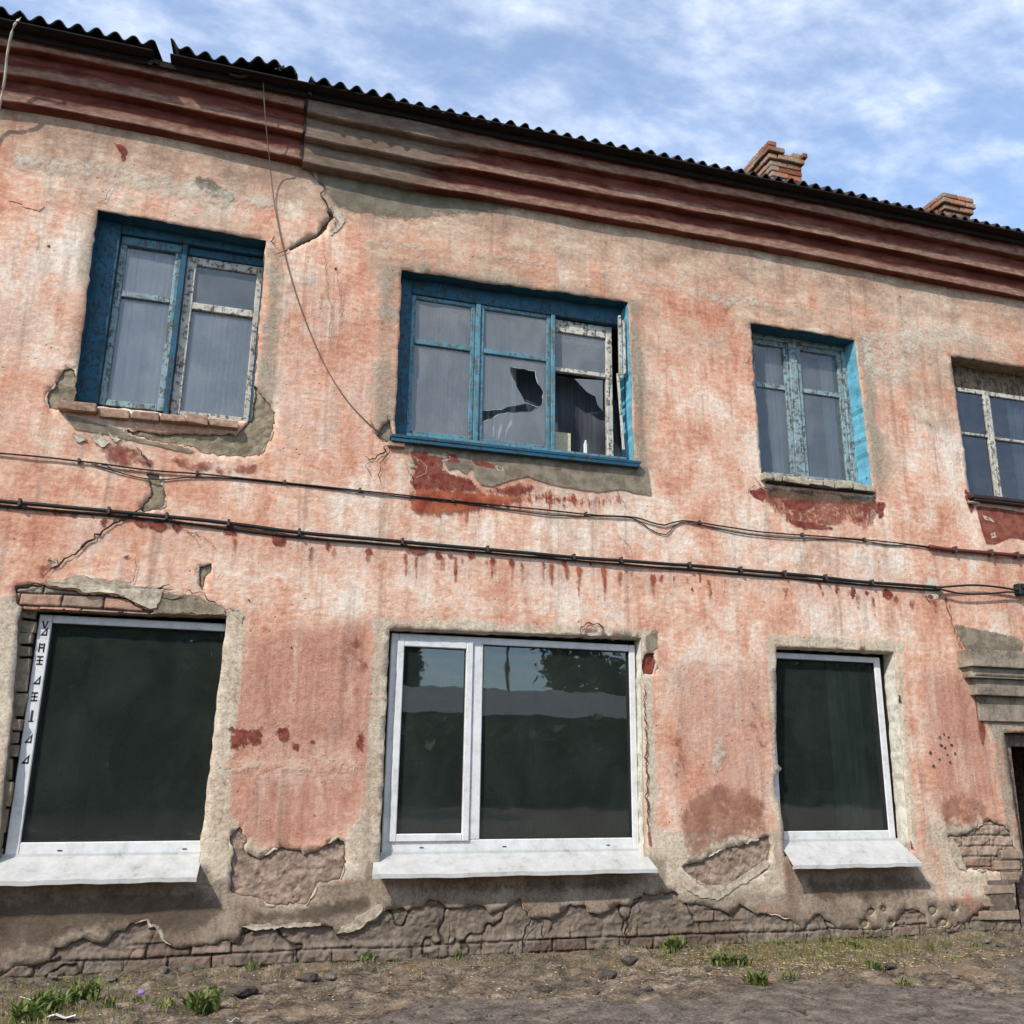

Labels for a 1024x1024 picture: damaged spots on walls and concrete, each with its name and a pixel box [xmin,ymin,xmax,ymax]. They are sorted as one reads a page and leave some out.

crack [270,98,342,345]
crack [90,447,151,473]
spalling [72,387,275,533]
peeling [749,488,885,530]
peeling [965,489,1024,544]
crack [15,506,145,590]
spalling [16,559,226,615]
crack [128,559,239,611]
spalling [228,827,346,908]
spalling [682,836,770,886]
flaking render [947,820,1023,920]
spalling [337,904,383,934]